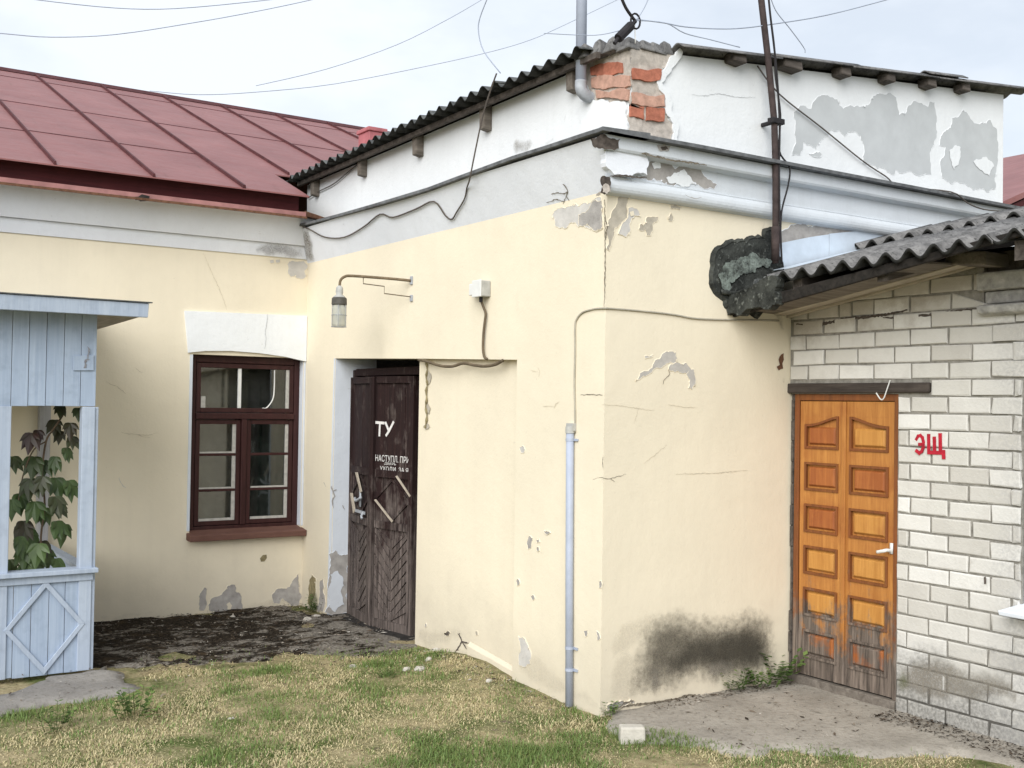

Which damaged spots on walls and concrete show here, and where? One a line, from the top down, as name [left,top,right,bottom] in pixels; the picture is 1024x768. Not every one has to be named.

flaking render [579,48,717,190]
peeling [792,92,999,193]
peeling [552,176,682,252]
peeling [635,351,696,390]
flaking render [198,584,243,612]
flaking render [271,550,348,615]
damp [644,624,764,686]